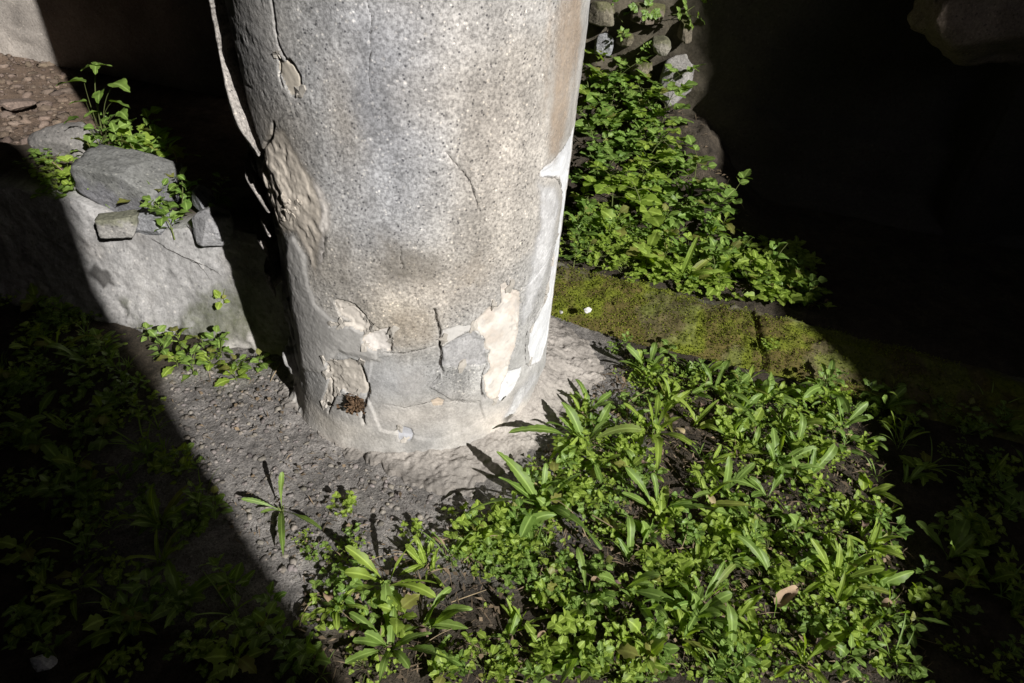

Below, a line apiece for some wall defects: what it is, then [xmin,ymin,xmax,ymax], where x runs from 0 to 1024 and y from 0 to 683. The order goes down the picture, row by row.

flaking render [208,0,323,298]
spalling [320,299,400,410]
crack [447,153,478,205]
spalling [438,115,576,406]